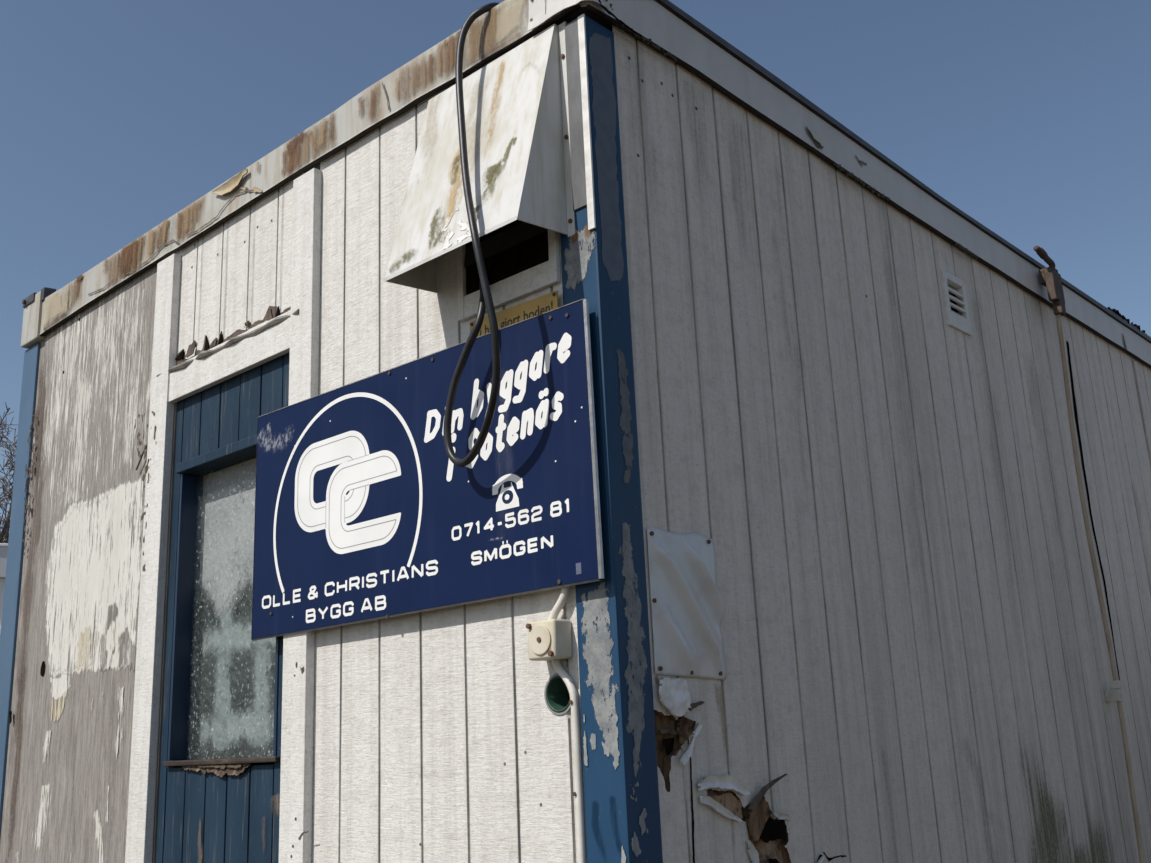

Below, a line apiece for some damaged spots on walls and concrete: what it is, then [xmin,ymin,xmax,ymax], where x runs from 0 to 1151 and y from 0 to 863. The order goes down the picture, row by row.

corrosion [395,8,519,99]
corrosion [358,84,378,117]
corrosion [281,114,333,174]
leakage [429,151,461,247]
leakage [474,139,513,216]
corrosion [105,198,203,286]
peeling [564,226,596,290]
leakage [11,366,46,831]
peeling [50,673,73,700]
peeling [581,521,705,863]
peeling [698,774,750,823]
spalling [747,811,791,863]